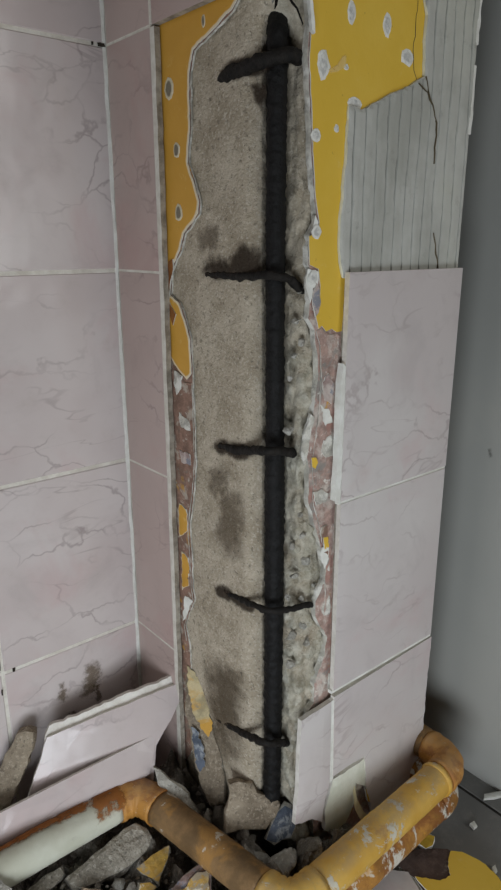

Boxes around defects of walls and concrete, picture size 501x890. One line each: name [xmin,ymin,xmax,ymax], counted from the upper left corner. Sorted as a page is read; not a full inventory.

spalling [347,0,356,25]
spalling [383,12,392,38]
spalling [401,49,413,67]
spalling [164,77,173,100]
crack [413,7,438,164]
spalling [347,97,362,108]
spalling [168,0,341,811]
spalling [249,820,310,857]